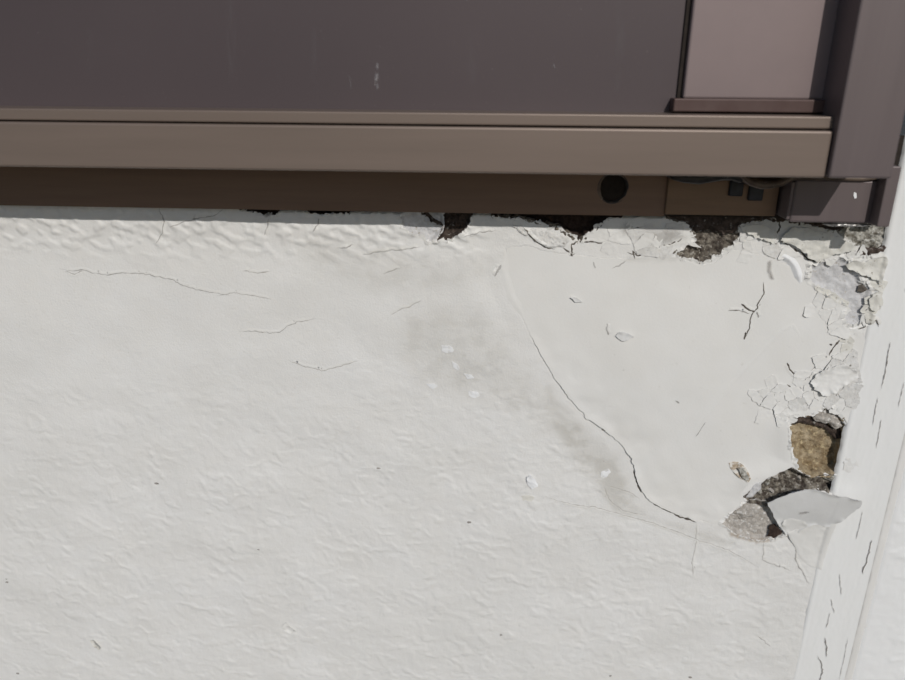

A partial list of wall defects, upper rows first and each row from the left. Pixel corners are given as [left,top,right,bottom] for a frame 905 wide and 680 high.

crack [156,209,223,243]
spalling [397,212,474,246]
crack [338,242,418,274]
crack [66,267,269,299]
crack [729,282,768,340]
crack [737,218,904,448]
crack [290,360,359,371]
peeling [491,214,888,542]